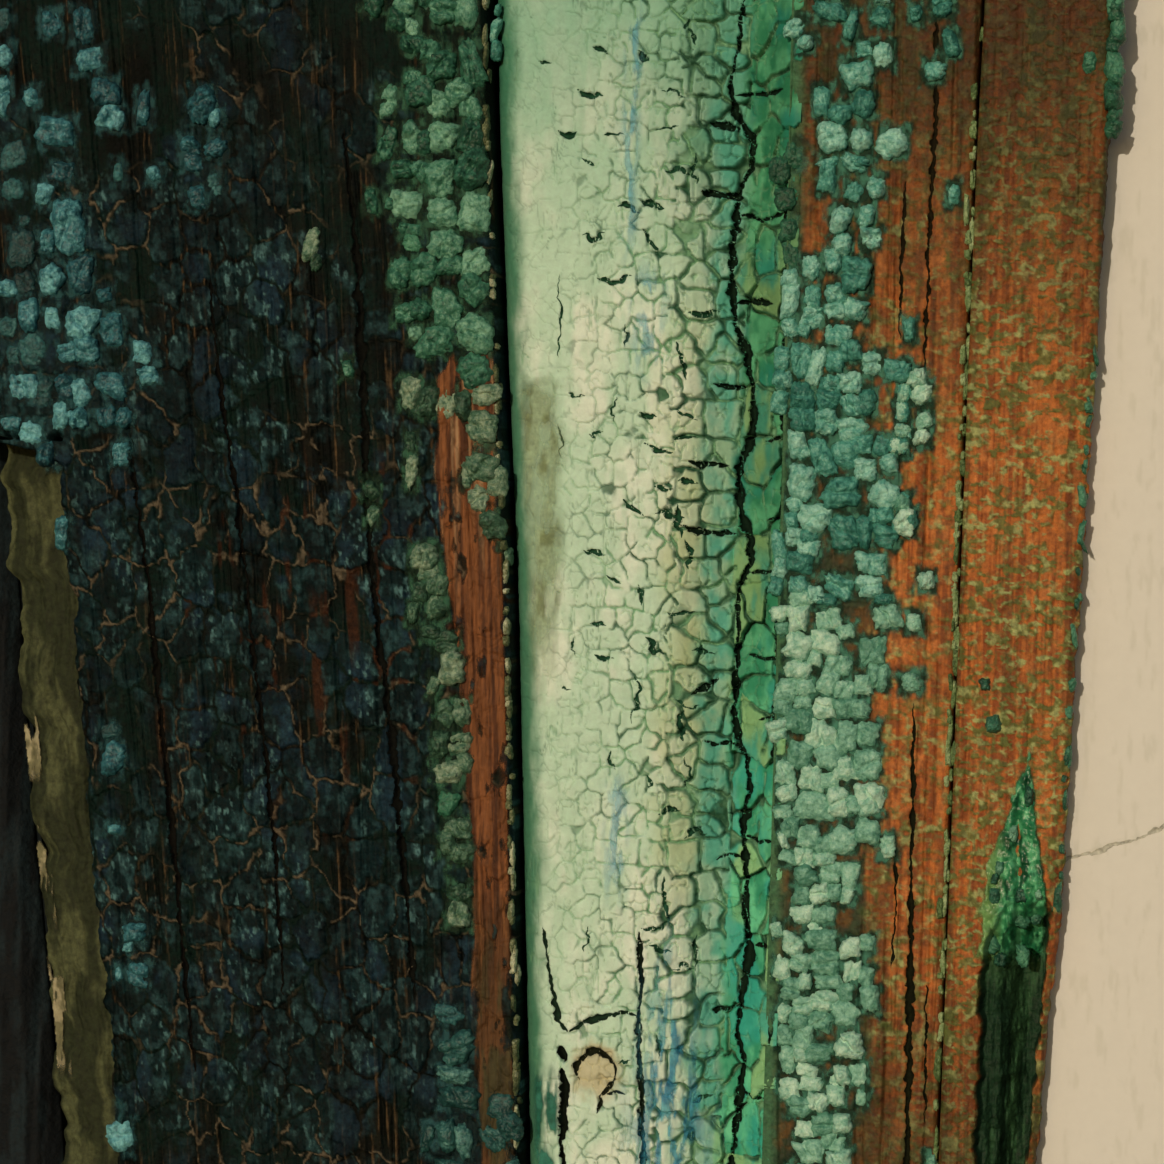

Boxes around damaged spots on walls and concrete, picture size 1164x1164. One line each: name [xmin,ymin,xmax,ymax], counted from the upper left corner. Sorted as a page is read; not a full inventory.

peeling [24,715,41,777]
peeling [48,967,71,1067]
peeling [0,0,163,472]
peeling [105,1099,137,1159]
crack [124,400,196,1072]
peeling [143,81,232,215]
crack [209,281,284,995]
crack [342,129,417,1001]
peeling [358,0,524,1164]
crack [542,0,788,1164]
peeling [765,0,978,1164]
peeling [977,752,1064,968]